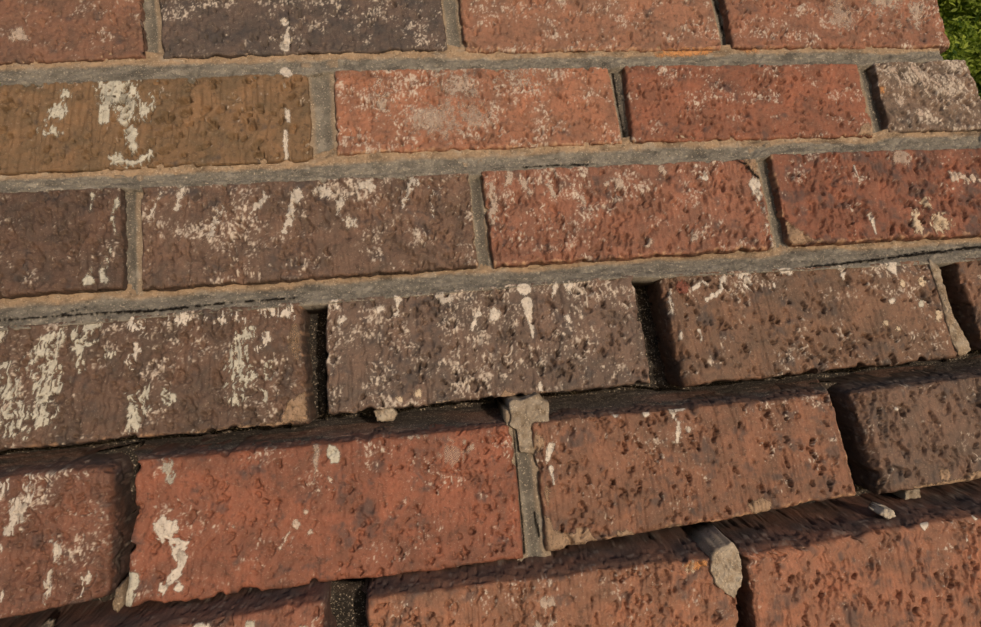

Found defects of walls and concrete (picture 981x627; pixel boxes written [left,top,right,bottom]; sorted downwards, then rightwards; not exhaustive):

spalling [543,486,597,551]